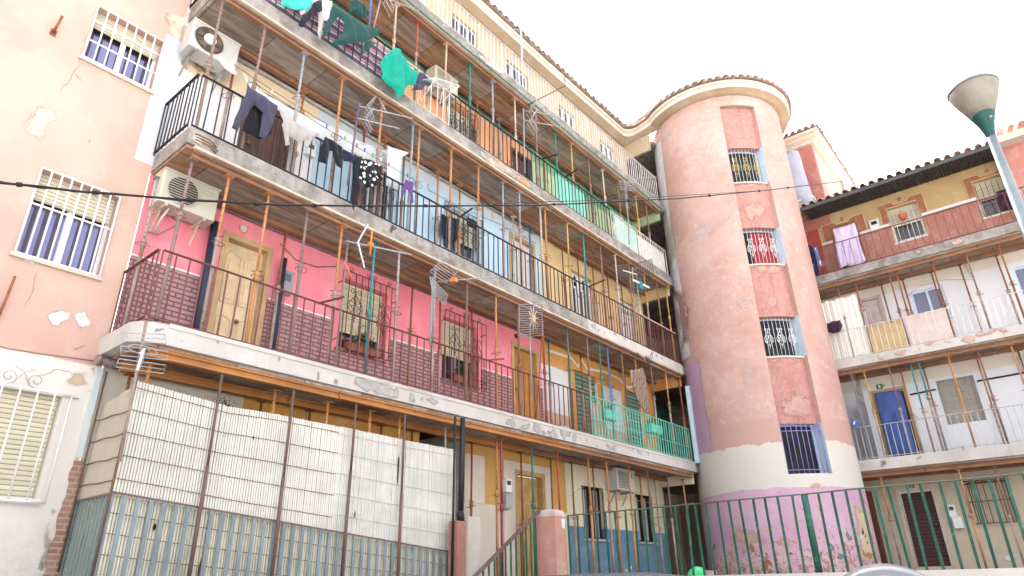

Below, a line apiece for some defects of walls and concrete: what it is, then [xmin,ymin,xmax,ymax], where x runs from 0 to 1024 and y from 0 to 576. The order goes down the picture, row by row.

peeling [48,310,91,327]
peeling [354,378,439,404]
flaking render [43,459,84,576]
peeling [814,503,873,572]